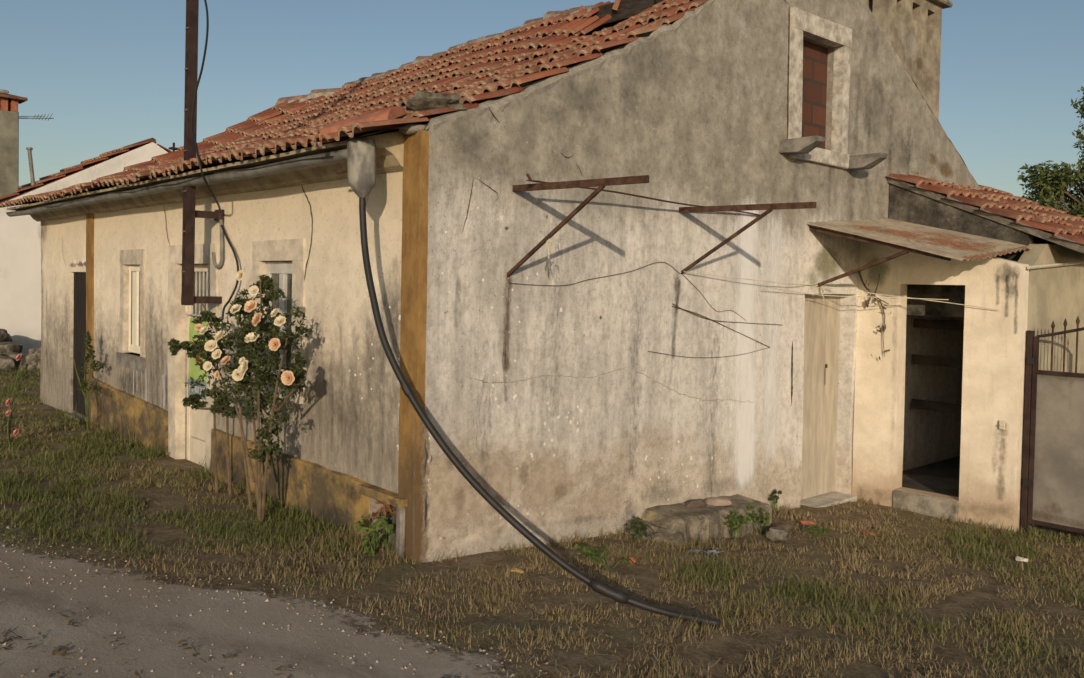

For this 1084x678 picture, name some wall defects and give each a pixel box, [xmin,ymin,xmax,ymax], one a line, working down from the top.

rust [860,225,1027,260]